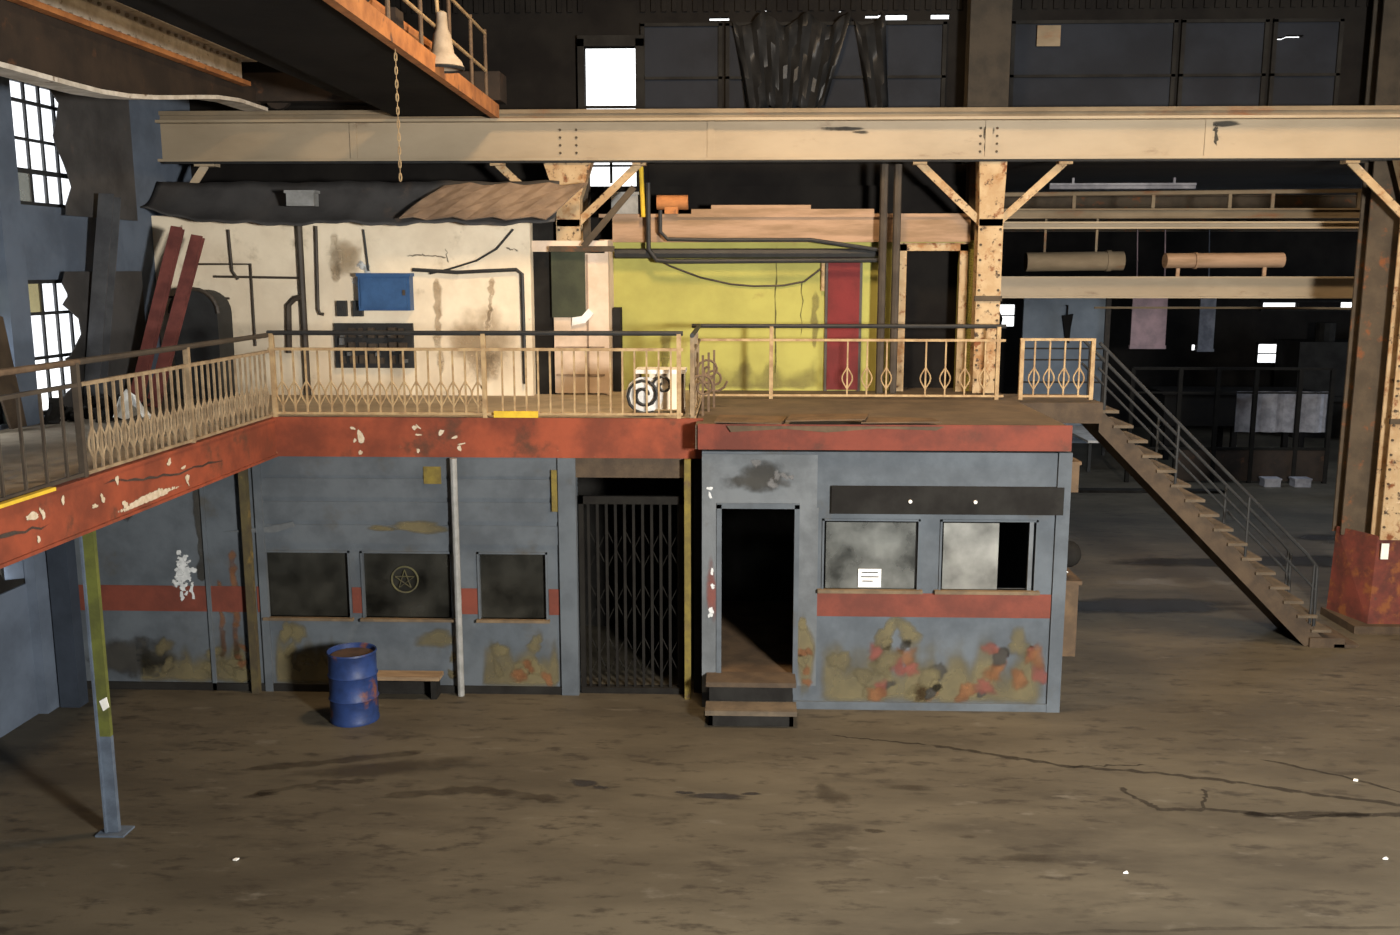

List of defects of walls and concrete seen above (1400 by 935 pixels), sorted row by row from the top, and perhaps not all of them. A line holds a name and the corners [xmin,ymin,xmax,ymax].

peeling [350,427,364,455]
peeling [121,458,190,512]
peeling [26,508,45,543]
crack [850,737,1400,819]